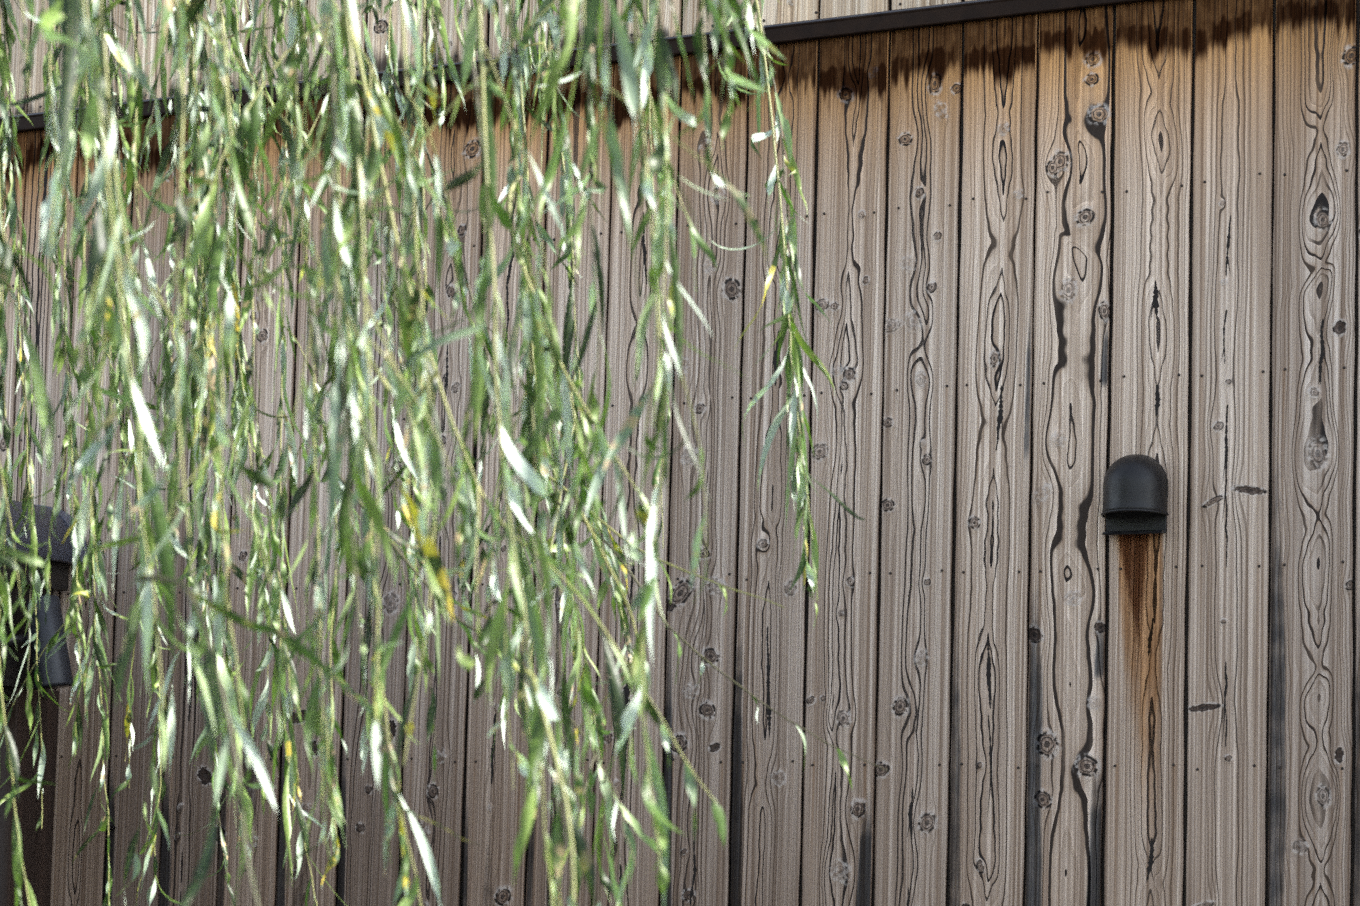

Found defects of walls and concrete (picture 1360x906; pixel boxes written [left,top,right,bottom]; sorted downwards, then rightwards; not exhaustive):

corrosion [1120,534,1148,620]